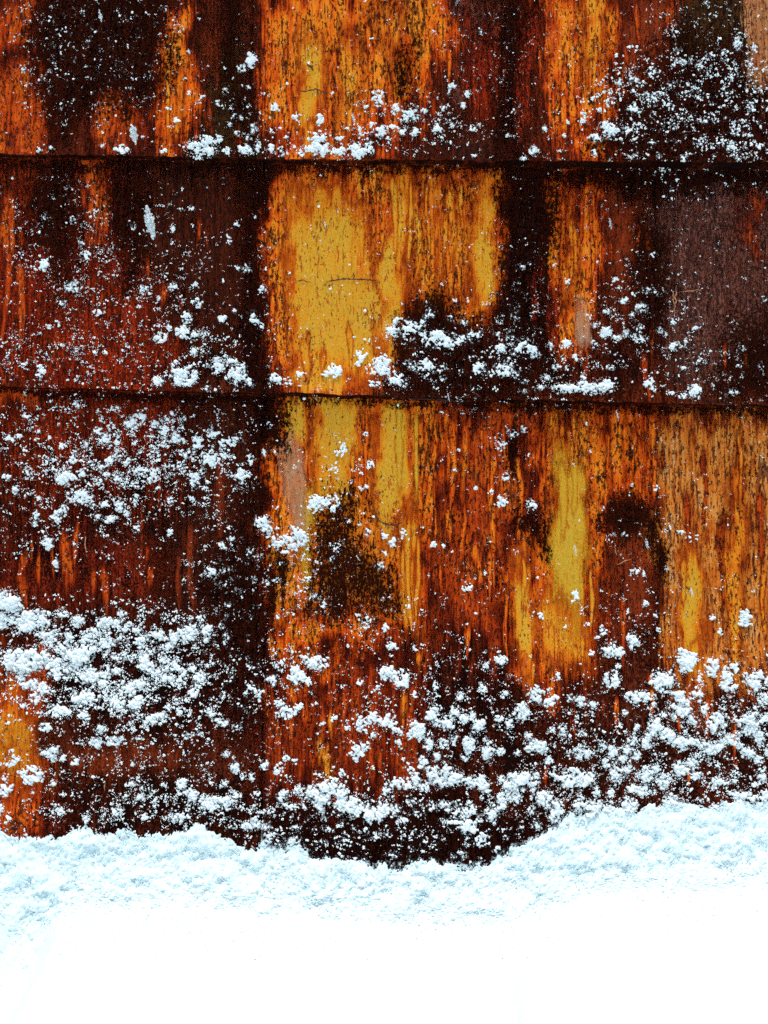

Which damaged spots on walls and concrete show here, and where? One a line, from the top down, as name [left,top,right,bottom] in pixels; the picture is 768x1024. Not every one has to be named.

corrosion [0,0,235,157]
corrosion [237,0,768,162]
corrosion [0,159,768,843]